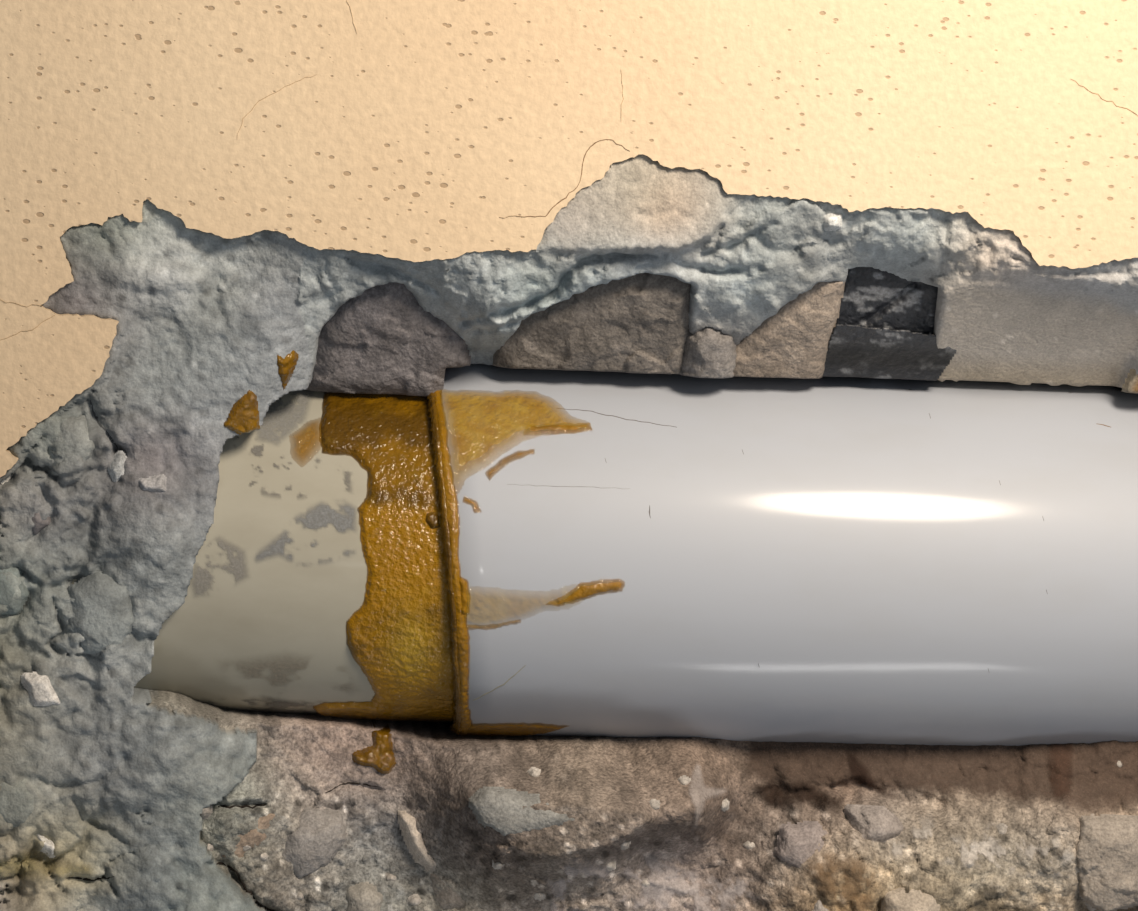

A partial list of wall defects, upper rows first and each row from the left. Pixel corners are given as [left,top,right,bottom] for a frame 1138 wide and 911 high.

crack [1074,80,1138,116]
spalling [297,154,1138,397]
spalling [0,199,1138,911]